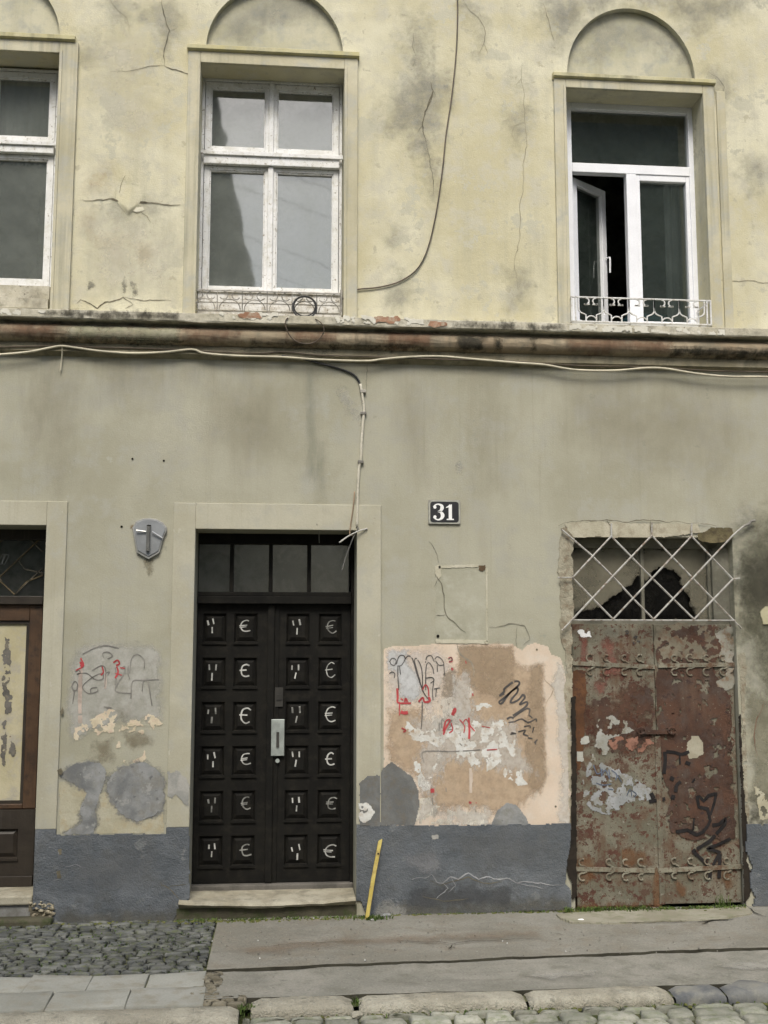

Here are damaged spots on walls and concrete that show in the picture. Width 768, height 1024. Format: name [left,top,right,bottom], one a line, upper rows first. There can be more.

crack [114,2,188,74]
crack [418,85,434,193]
crack [84,178,173,221]
crack [80,297,171,309]
peeling [219,311,290,320]
peeling [335,315,447,328]
crack [432,545,474,676]
spalling [557,521,733,823]
peeling [74,709,163,748]
peeling [405,686,527,839]
rust [572,624,737,841]
peeling [57,768,164,834]